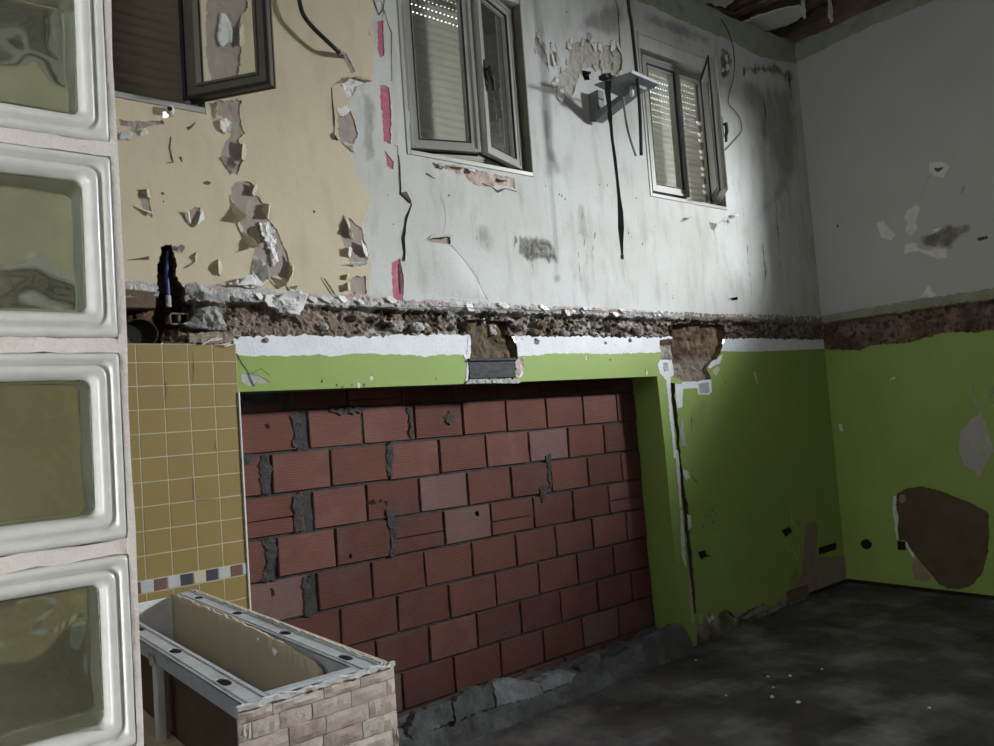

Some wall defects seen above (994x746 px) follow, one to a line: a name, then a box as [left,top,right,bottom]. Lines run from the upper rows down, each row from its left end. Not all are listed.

peeling [331,53,394,169]
peeling [534,28,624,102]
damp [515,237,555,263]
spalling [125,99,994,351]
damp [924,226,966,247]
peeling [958,382,994,477]
crack [666,381,697,624]
spalling [892,486,989,589]
spalling [696,599,790,644]